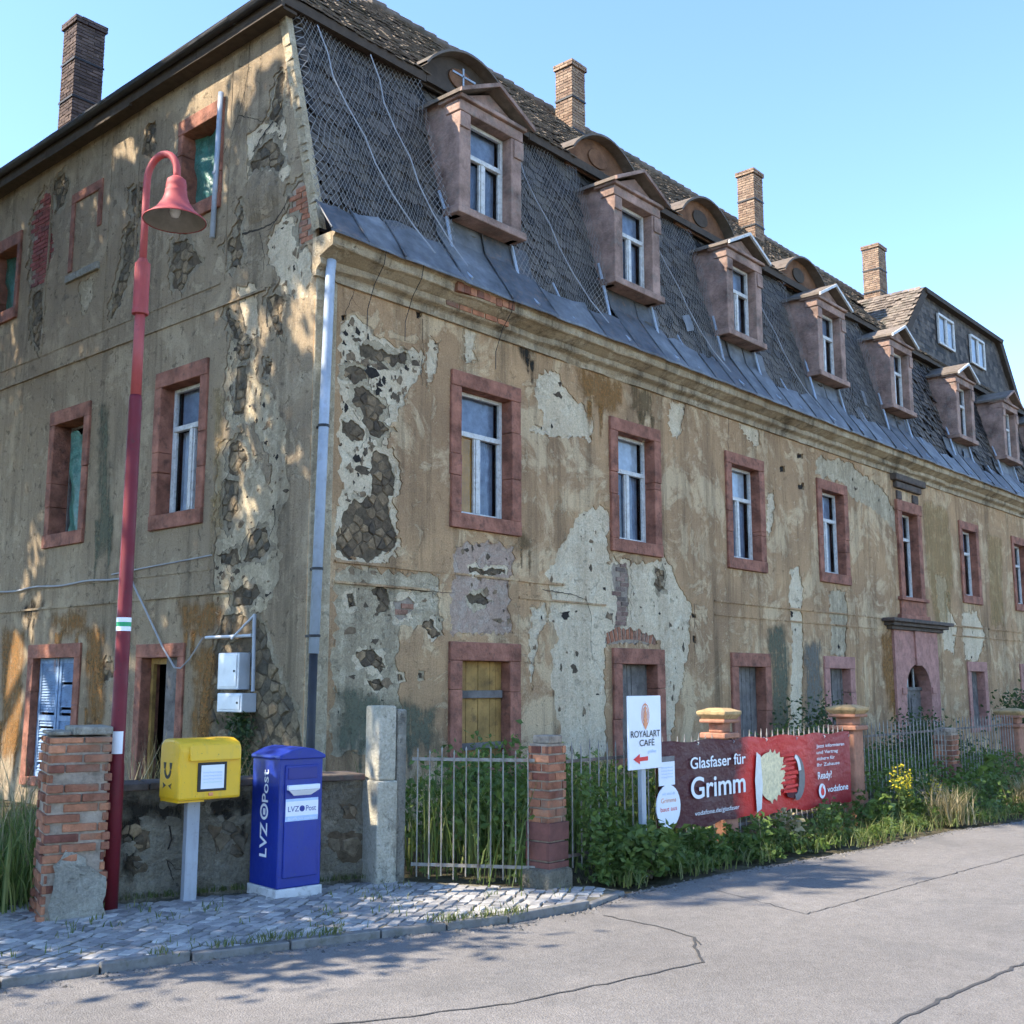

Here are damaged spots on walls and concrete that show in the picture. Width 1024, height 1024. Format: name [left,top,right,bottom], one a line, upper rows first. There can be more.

spalling [26,167,71,355]
spalling [108,183,151,320]
spalling [167,233,205,295]
spalling [199,67,316,762]
flaking render [529,369,594,443]
flaking render [328,314,516,757]
flaking render [527,505,692,763]
flaking render [788,566,804,736]
flaking render [935,573,986,662]